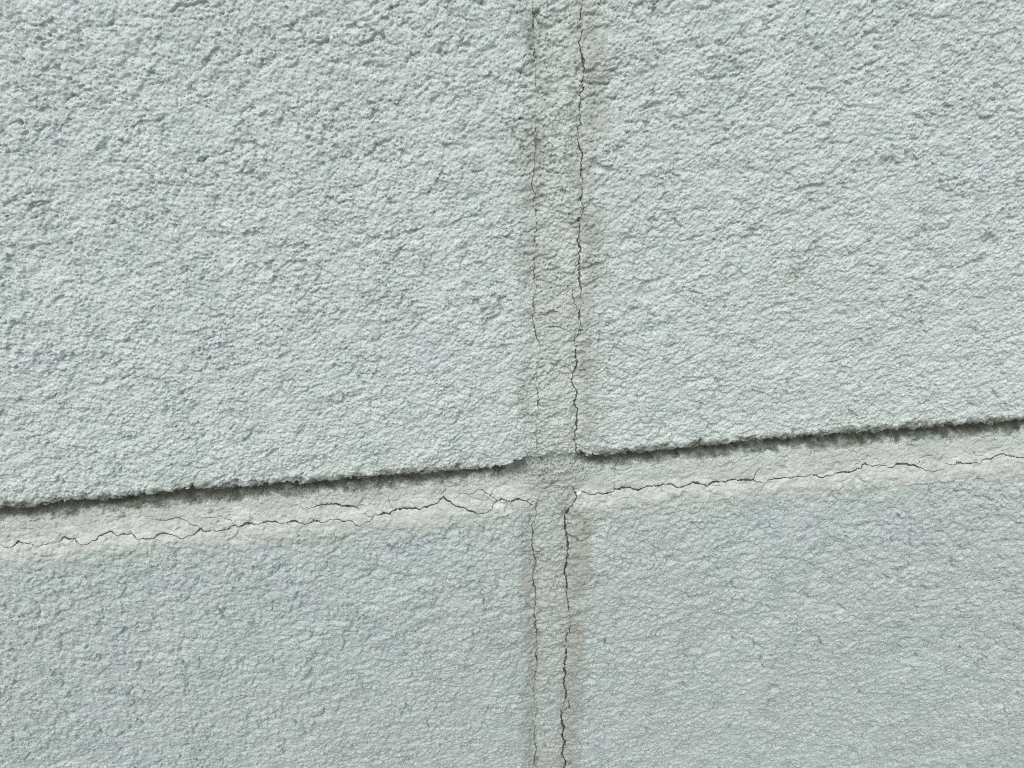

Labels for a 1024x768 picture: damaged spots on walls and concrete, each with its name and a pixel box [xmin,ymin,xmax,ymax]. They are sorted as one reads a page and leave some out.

crack [531,0,585,452]
crack [2,452,1024,768]